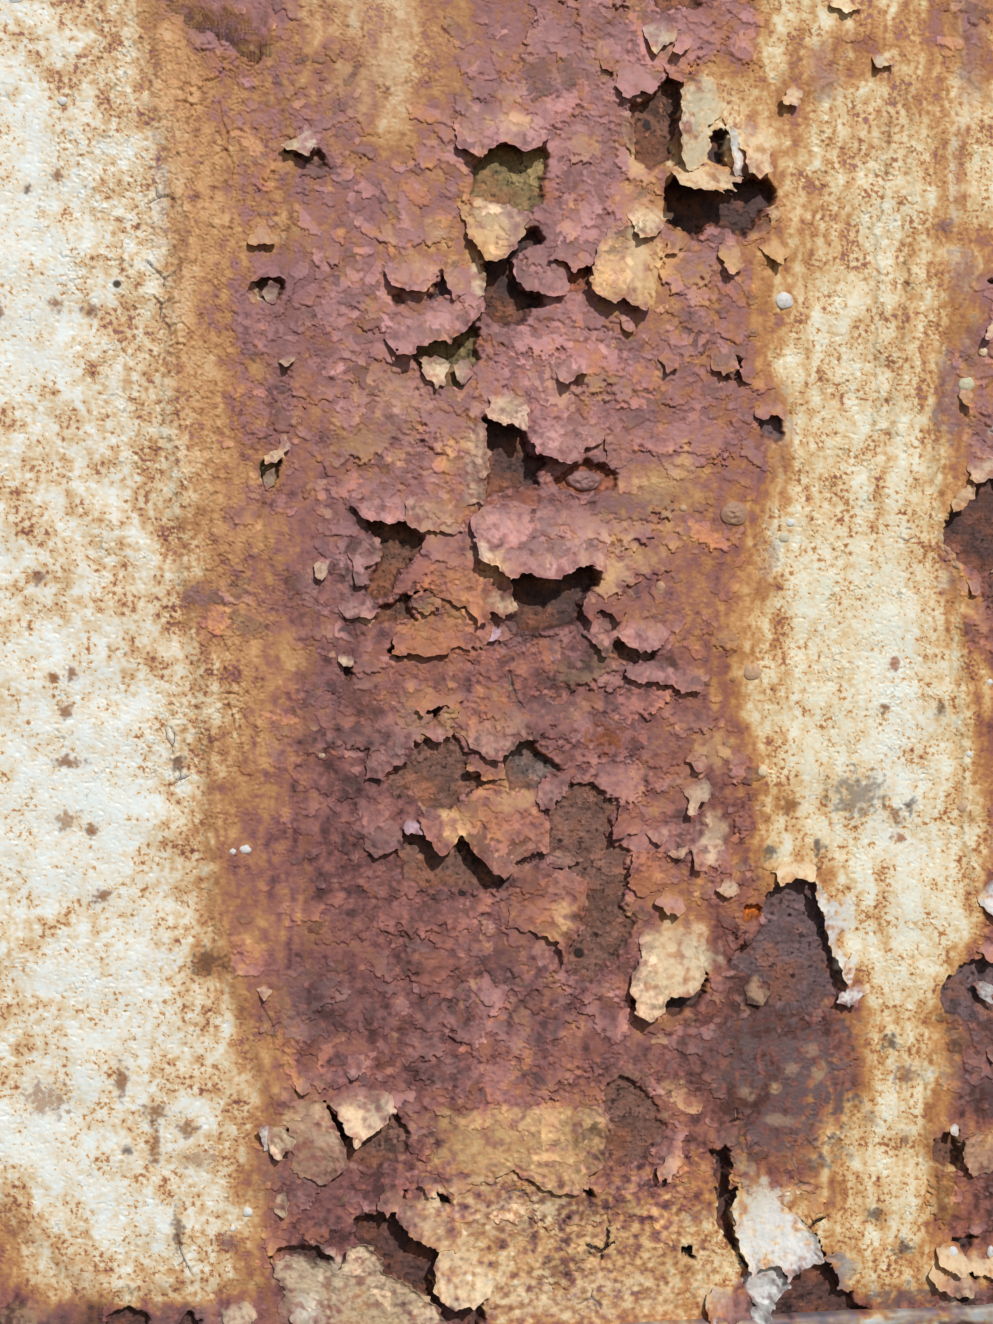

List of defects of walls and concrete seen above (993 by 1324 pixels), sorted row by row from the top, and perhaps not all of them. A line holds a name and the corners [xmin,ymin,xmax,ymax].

peeling [642,19,693,55]
peeling [781,85,803,107]
corrosion [384,52,791,389]
corrosion [870,90,916,438]
corrosion [754,401,788,442]
peeling [582,587,630,657]
corrosion [928,314,993,890]
corrosion [0,0,709,1324]
peeling [681,744,713,816]
peeling [976,880,993,915]
corrosion [705,839,993,1324]
peeling [222,1300,258,1324]